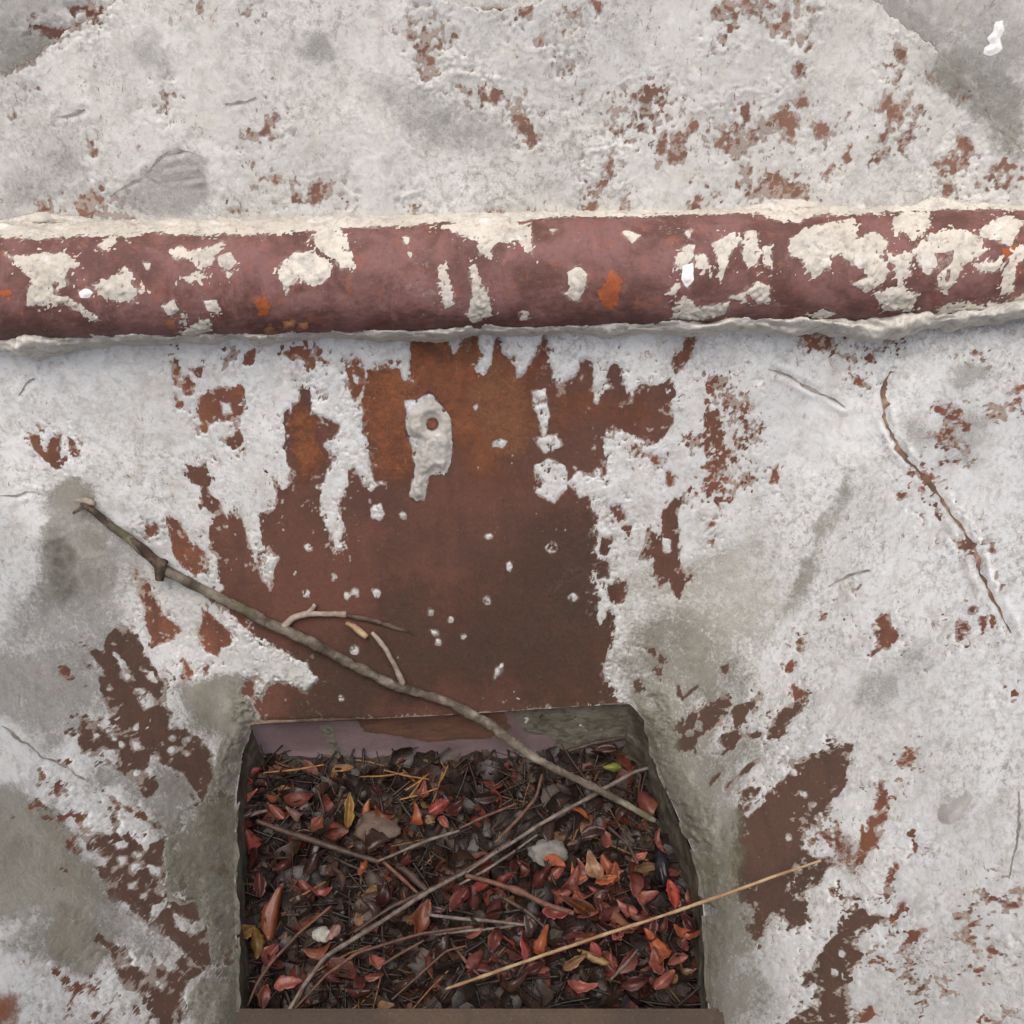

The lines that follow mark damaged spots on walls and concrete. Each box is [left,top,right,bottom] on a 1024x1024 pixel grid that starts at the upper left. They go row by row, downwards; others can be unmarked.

corrosion [440,55,545,152]
corrosion [579,0,853,211]
corrosion [866,37,978,170]
corrosion [931,123,1024,202]
peeling [664,276,681,302]
peeling [805,309,836,320]
crack [880,371,1011,633]
water stain [0,477,139,752]
water stain [176,674,255,745]
corrosion [24,292,1024,1024]
water stain [0,786,169,975]
water stain [87,760,224,929]